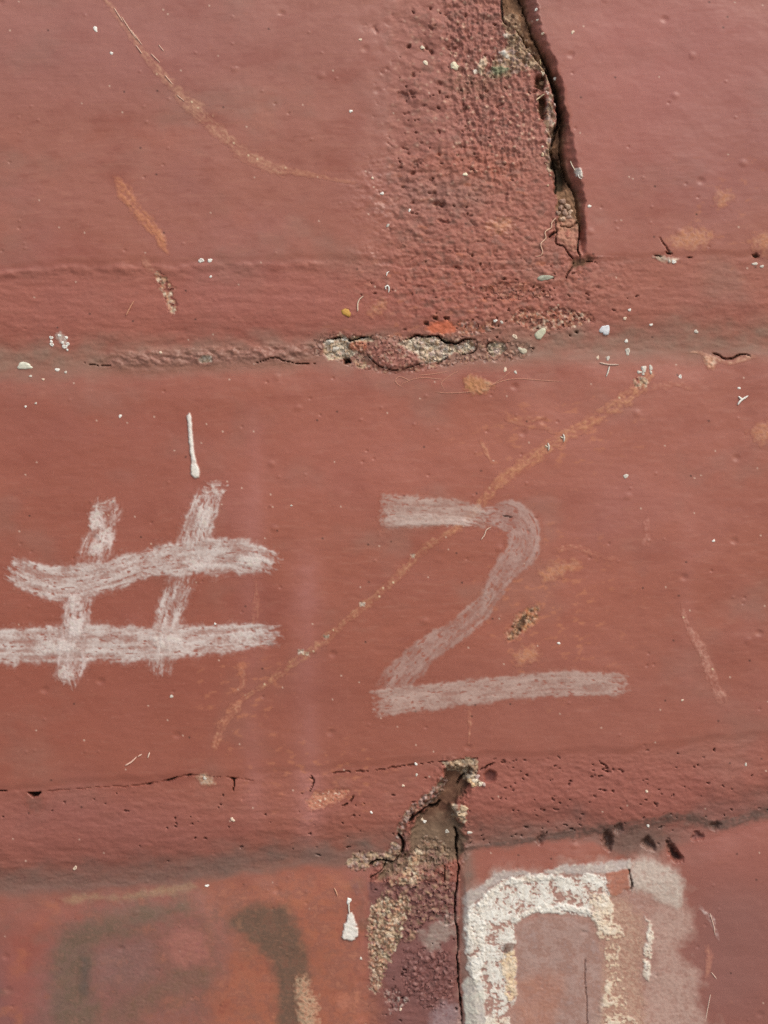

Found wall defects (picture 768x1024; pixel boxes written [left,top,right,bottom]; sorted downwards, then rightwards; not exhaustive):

crack [500,0,598,281]
peeling [309,275,610,375]
crack [369,857,387,880]
spalling [344,756,486,1012]
crack [444,826,460,933]
peeling [605,867,634,898]
peeling [502,941,517,954]